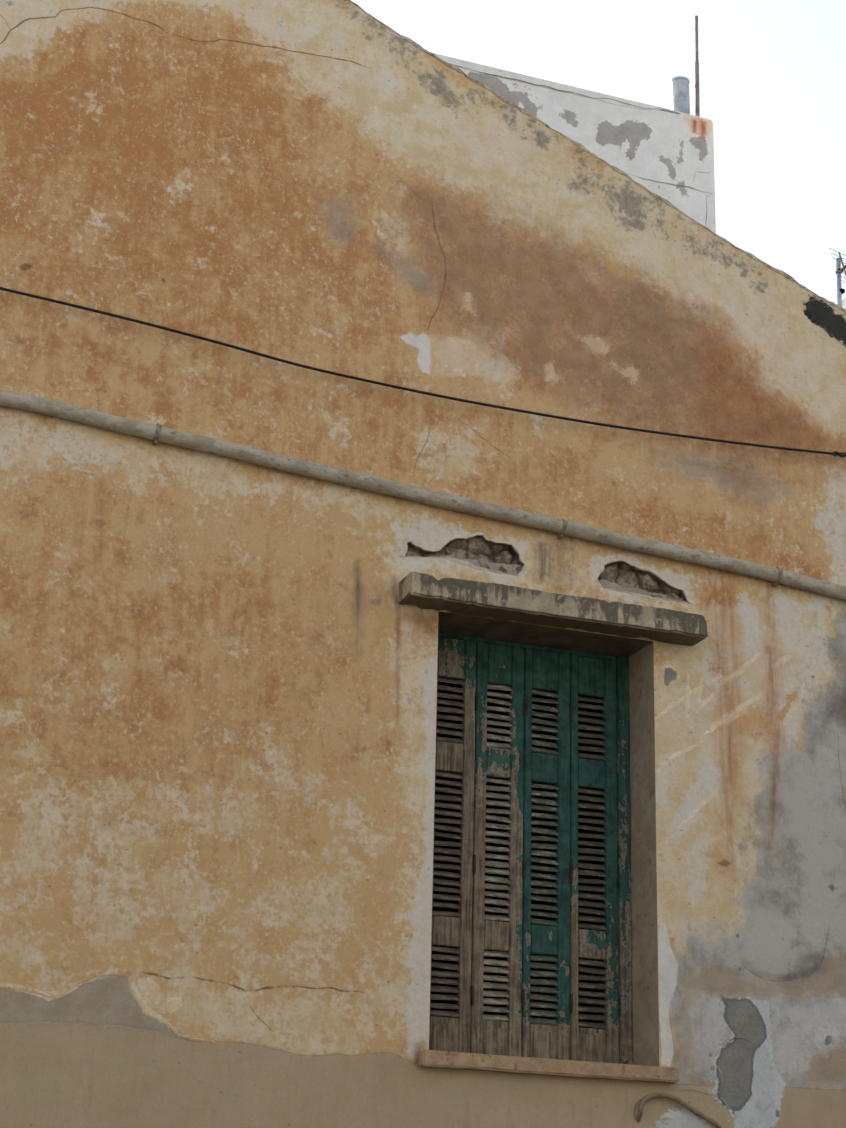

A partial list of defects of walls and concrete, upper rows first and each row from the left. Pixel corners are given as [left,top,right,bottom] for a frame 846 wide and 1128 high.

crack [0,7,368,68]
peeling [596,120,652,160]
peeling [659,136,708,197]
rust [686,116,712,137]
crack [407,184,454,332]
water stain [375,187,846,505]
spalling [402,532,528,576]
spalling [594,559,692,604]
peeling [0,972,215,1044]
crack [143,972,363,1032]
peeling [658,921,680,1067]
peeling [656,995,846,1128]